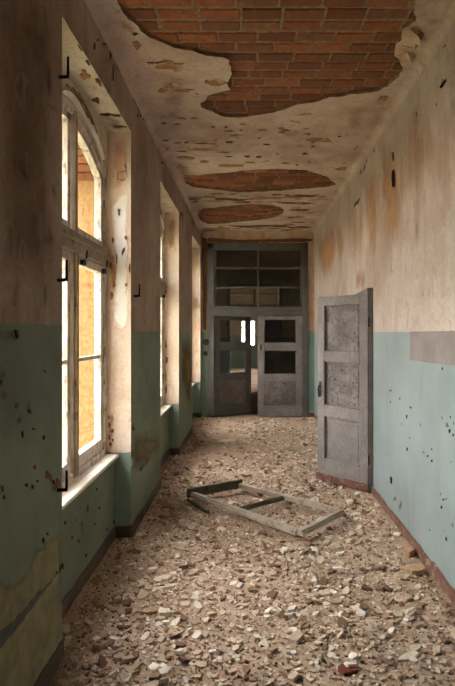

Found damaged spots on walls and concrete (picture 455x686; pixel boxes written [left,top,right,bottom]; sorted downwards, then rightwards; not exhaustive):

flaking render [117,0,424,331]
peeling [113,195,127,326]
peeling [0,532,63,686]